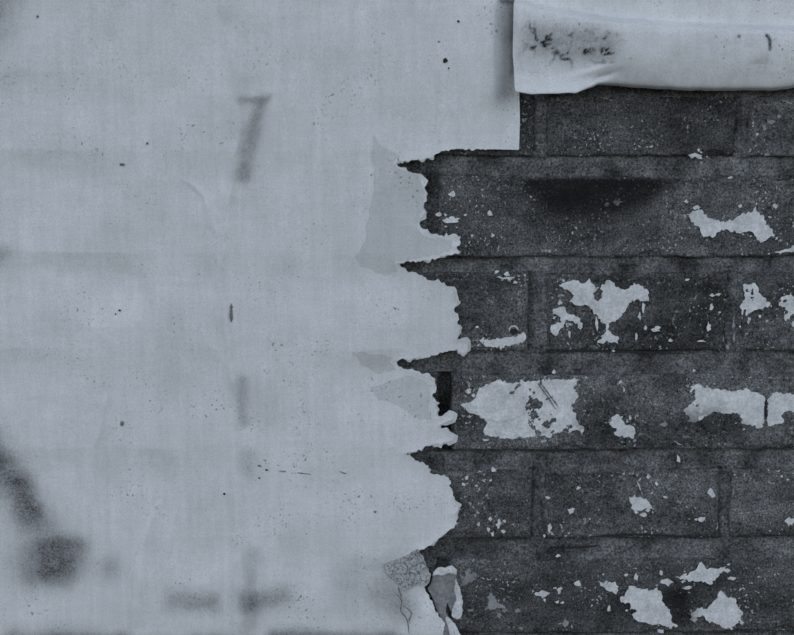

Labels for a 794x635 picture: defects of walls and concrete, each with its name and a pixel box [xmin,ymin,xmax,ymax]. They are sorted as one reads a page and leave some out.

peeling [435,212,467,228]
peeling [684,199,778,243]
peeling [477,325,526,349]
peeling [550,278,661,352]
peeling [726,283,794,349]
peeling [461,369,584,441]
peeling [605,414,636,442]
peeling [684,383,794,430]
peeling [629,473,658,517]
peeling [484,593,520,618]
peeling [532,587,564,604]
peeling [598,562,744,633]